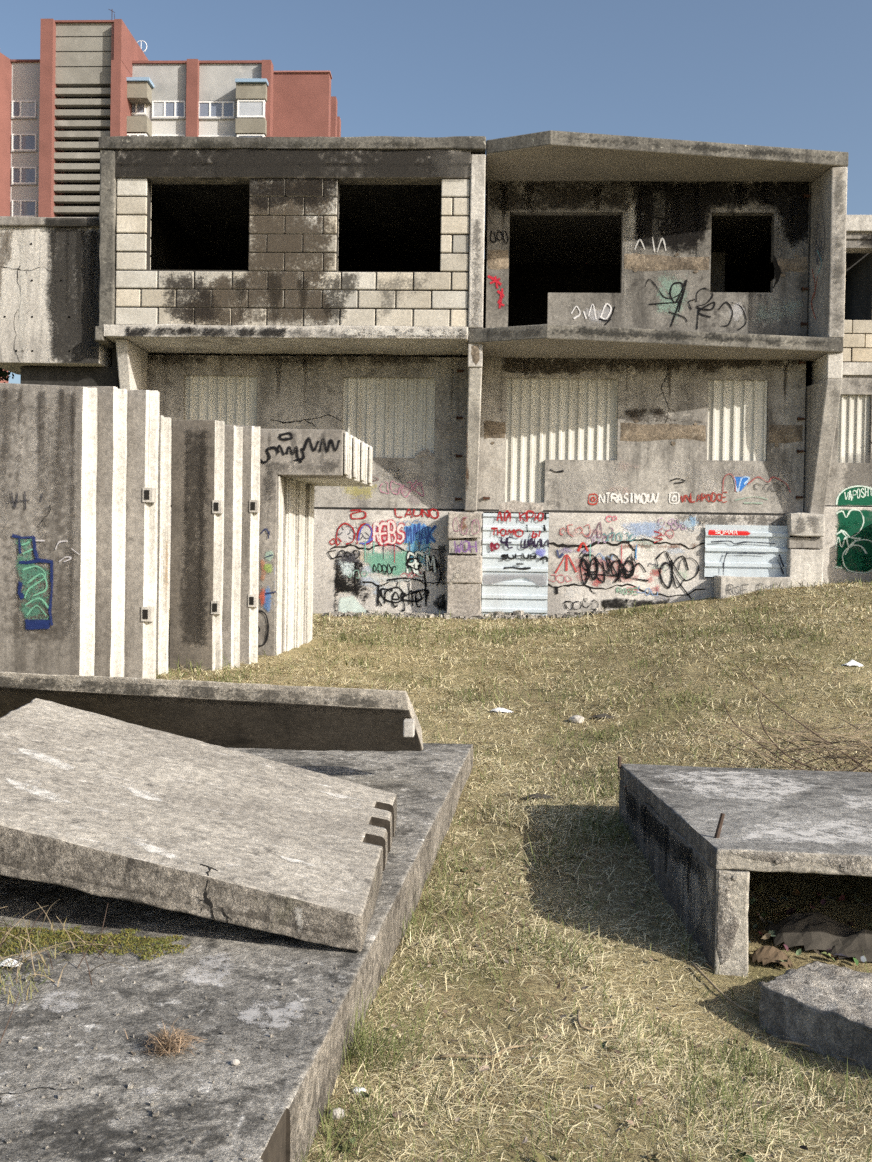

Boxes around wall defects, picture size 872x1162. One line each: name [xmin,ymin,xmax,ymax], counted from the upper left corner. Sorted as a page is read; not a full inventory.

leakage [627,186,661,245]
leakage [0,231,26,348]
leakage [40,231,97,307]
crack [196,864,233,923]